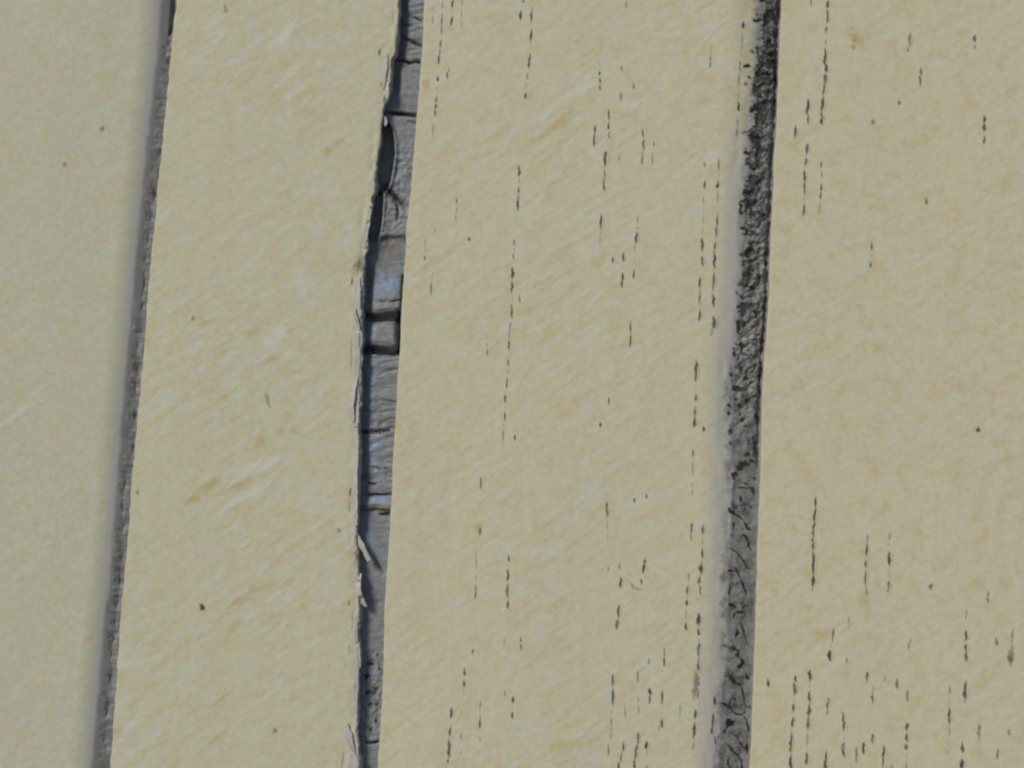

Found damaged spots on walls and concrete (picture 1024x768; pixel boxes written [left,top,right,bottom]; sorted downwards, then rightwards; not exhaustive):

peeling [378,48,389,126]
peeling [348,203,372,428]
damp [717,0,779,768]
peeling [344,441,372,768]